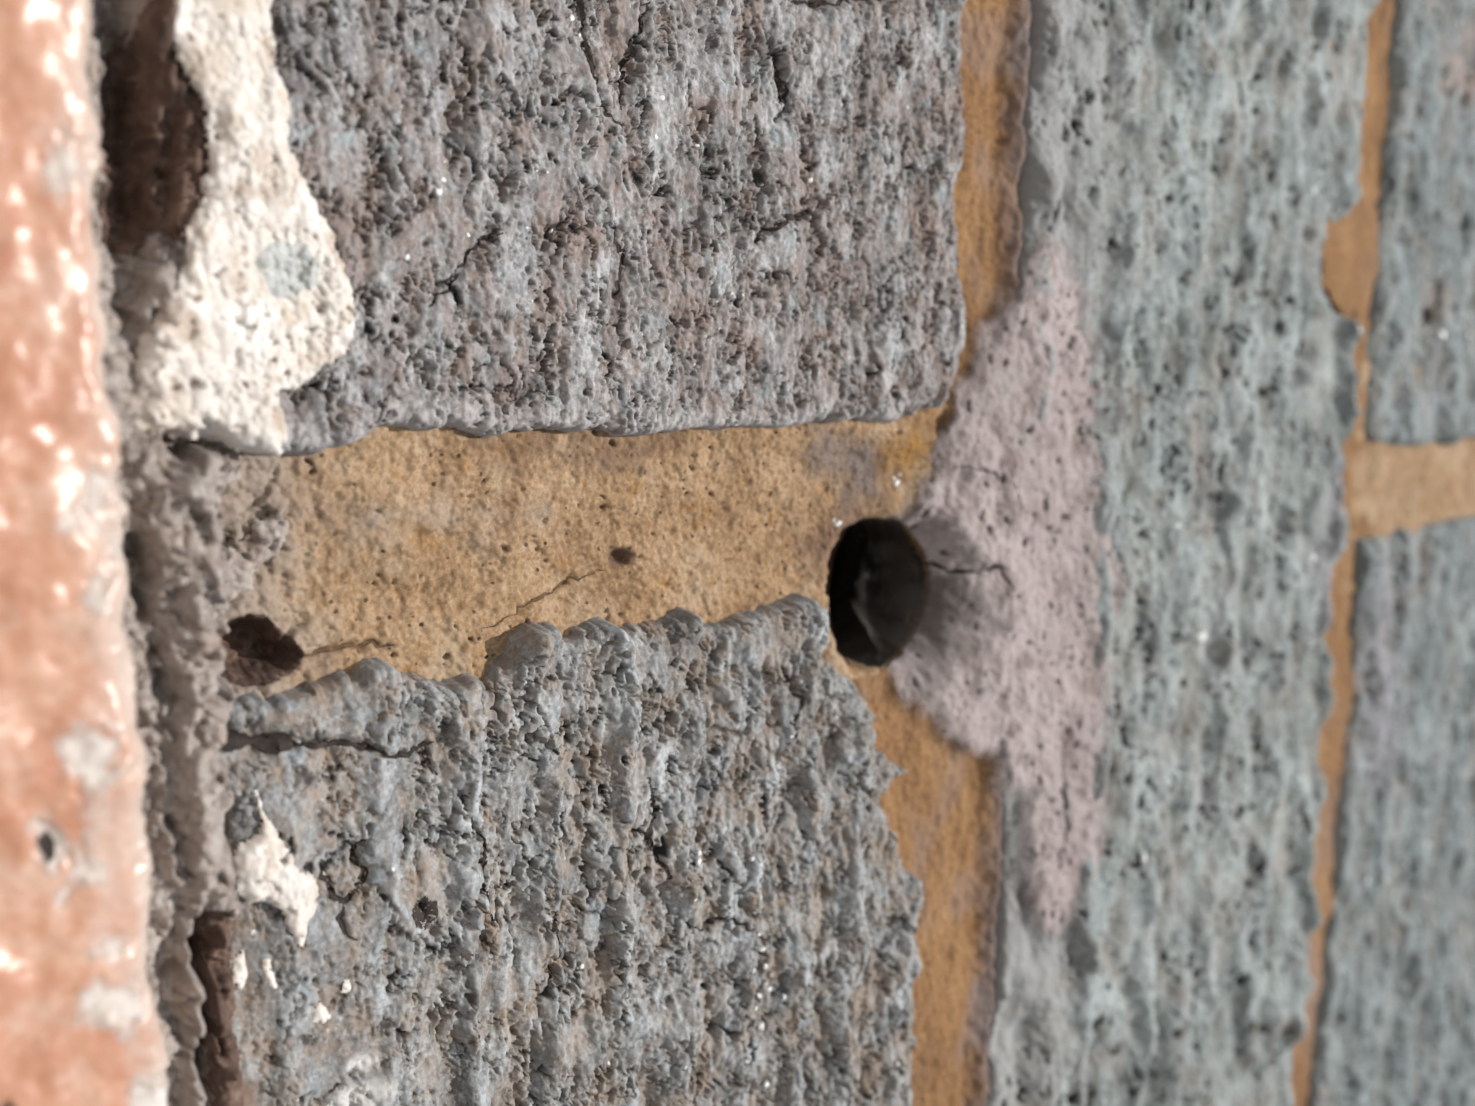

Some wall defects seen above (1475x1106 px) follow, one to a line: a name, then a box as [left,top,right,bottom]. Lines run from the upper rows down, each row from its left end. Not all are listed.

spalling [166,447,305,712]
crack [879,557,1015,593]
crack [958,465,1022,531]
spalling [196,745,233,902]